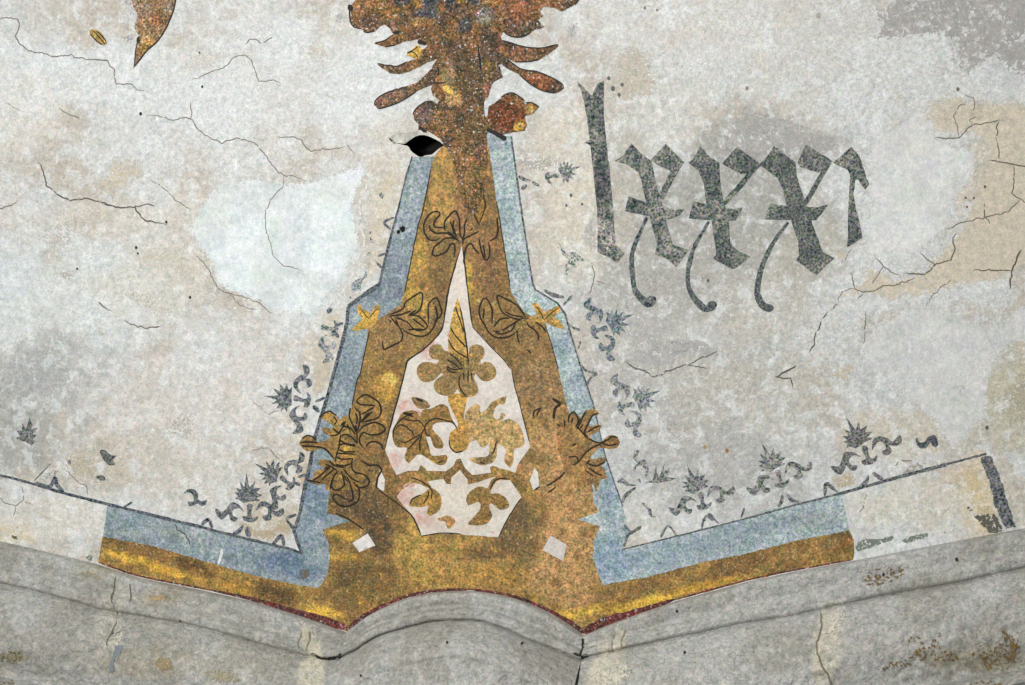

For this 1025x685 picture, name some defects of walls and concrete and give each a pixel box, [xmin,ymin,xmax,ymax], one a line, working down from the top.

crack [0,17,354,272]
spalling [389,130,455,157]
crack [98,302,161,329]
crack [193,253,271,313]
peeling [302,159,405,333]
crack [776,95,1025,387]